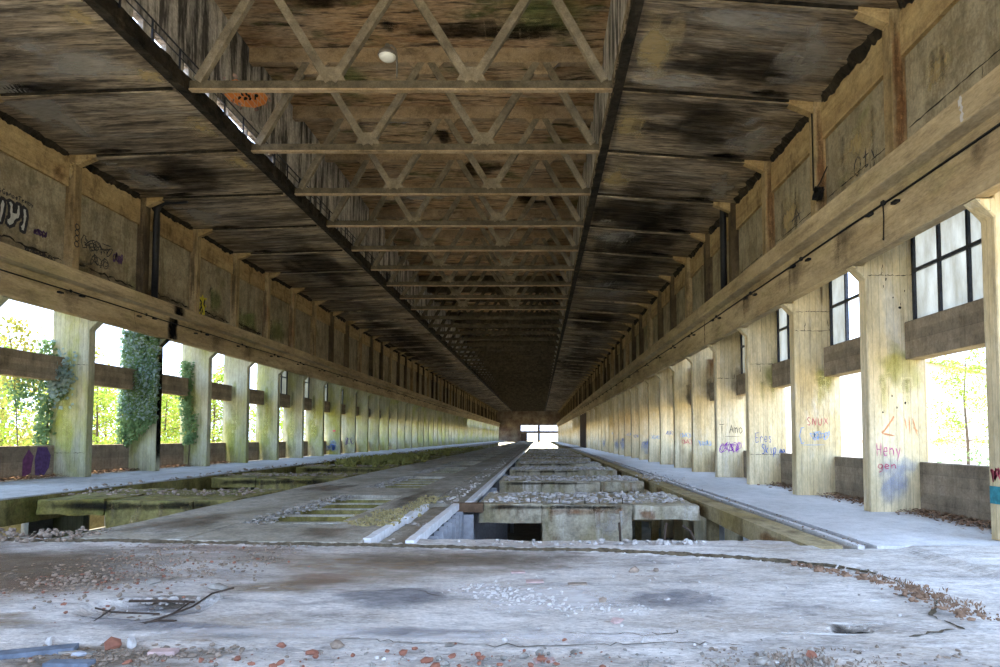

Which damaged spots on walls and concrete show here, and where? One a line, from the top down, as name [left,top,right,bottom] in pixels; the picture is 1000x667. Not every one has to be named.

rust [894,35,905,143]